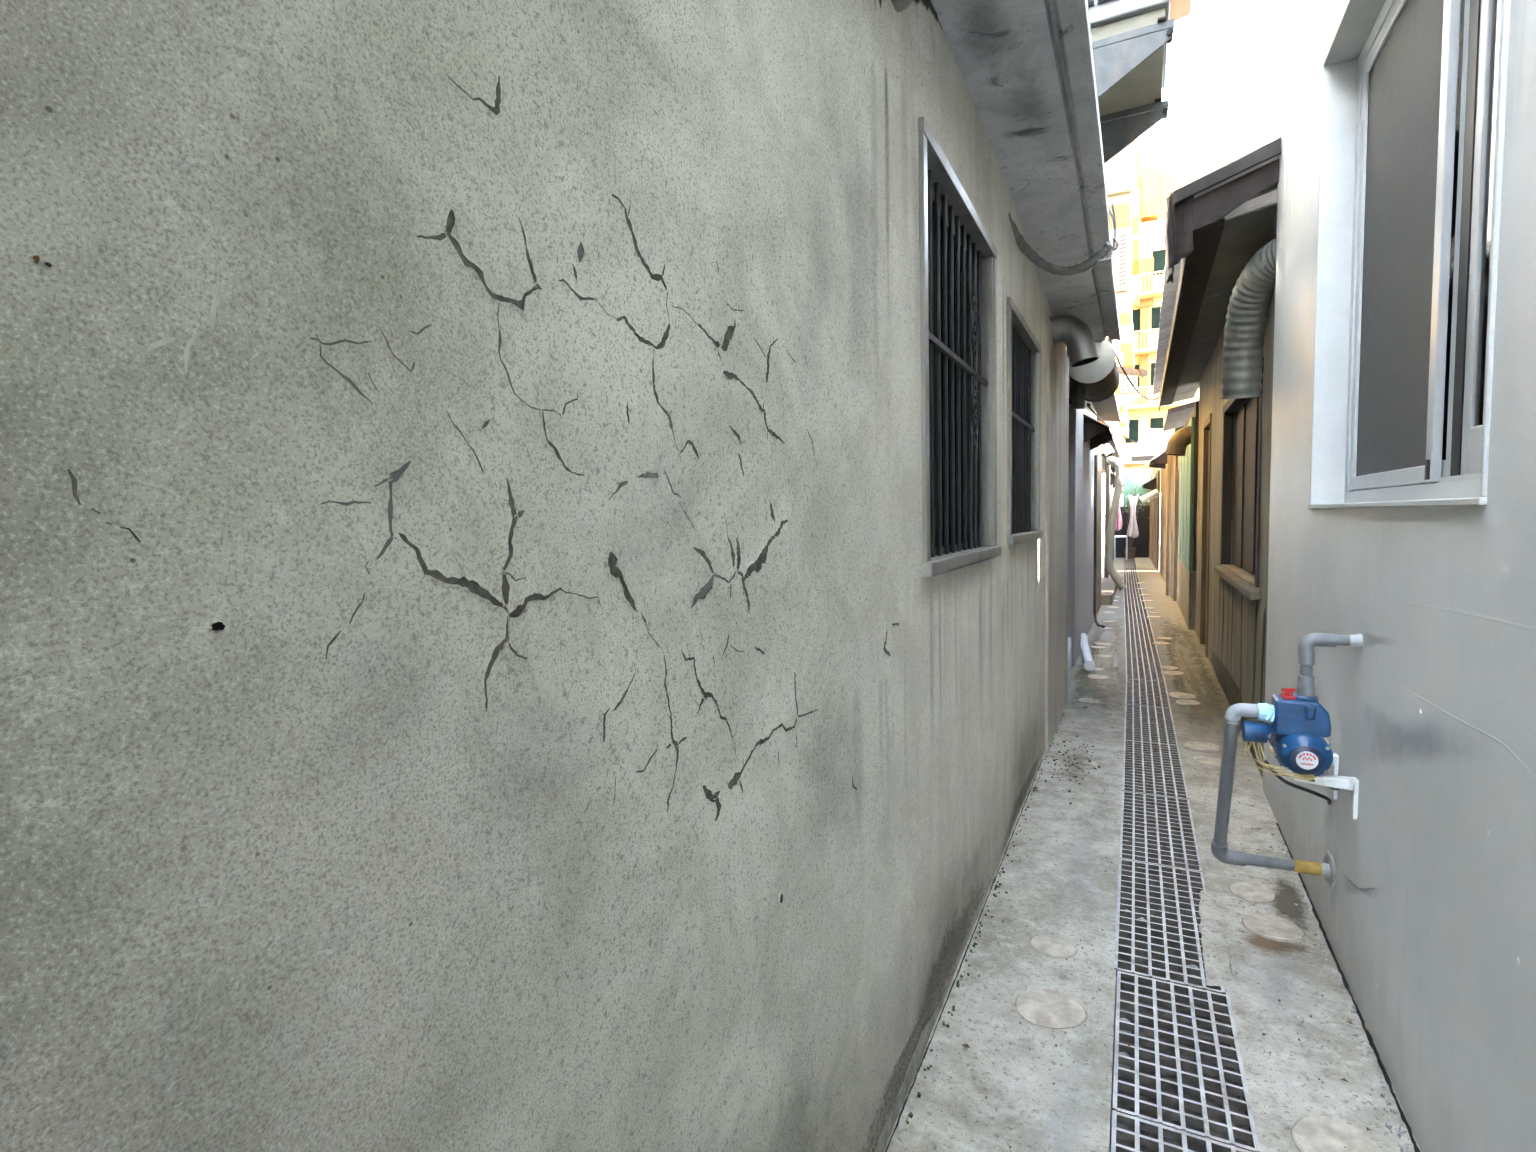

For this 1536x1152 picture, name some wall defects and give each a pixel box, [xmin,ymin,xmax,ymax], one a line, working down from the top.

crack [445,71,505,123]
crack [53,466,151,548]
crack [307,189,818,824]